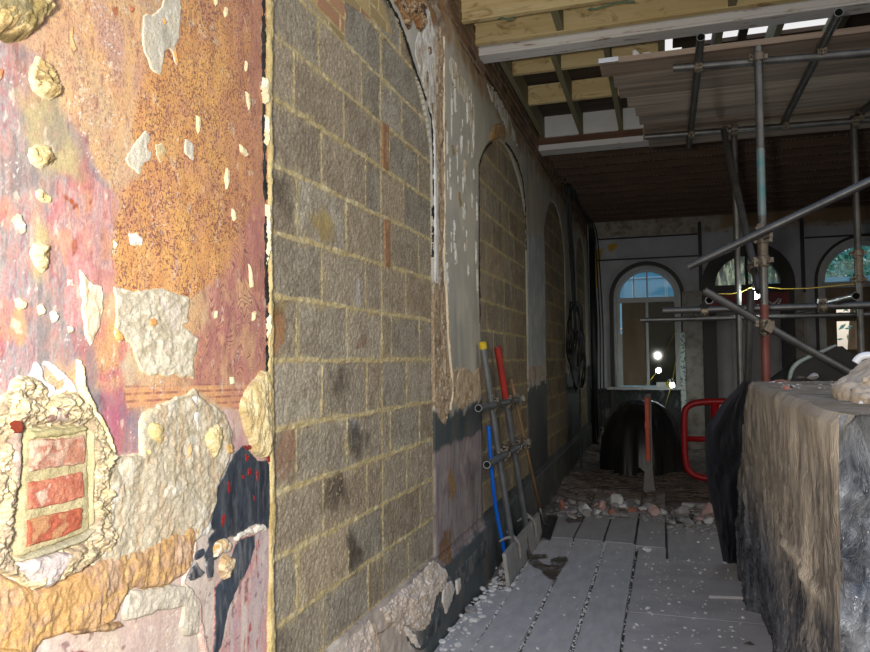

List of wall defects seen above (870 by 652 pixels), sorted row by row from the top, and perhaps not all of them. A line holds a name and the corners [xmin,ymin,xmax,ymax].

peeling [142,0,182,74]
peeling [126,131,166,174]
peeling [393,0,479,293]
spalling [0,270,270,652]
flaking render [336,620,379,652]
peeling [380,537,489,651]